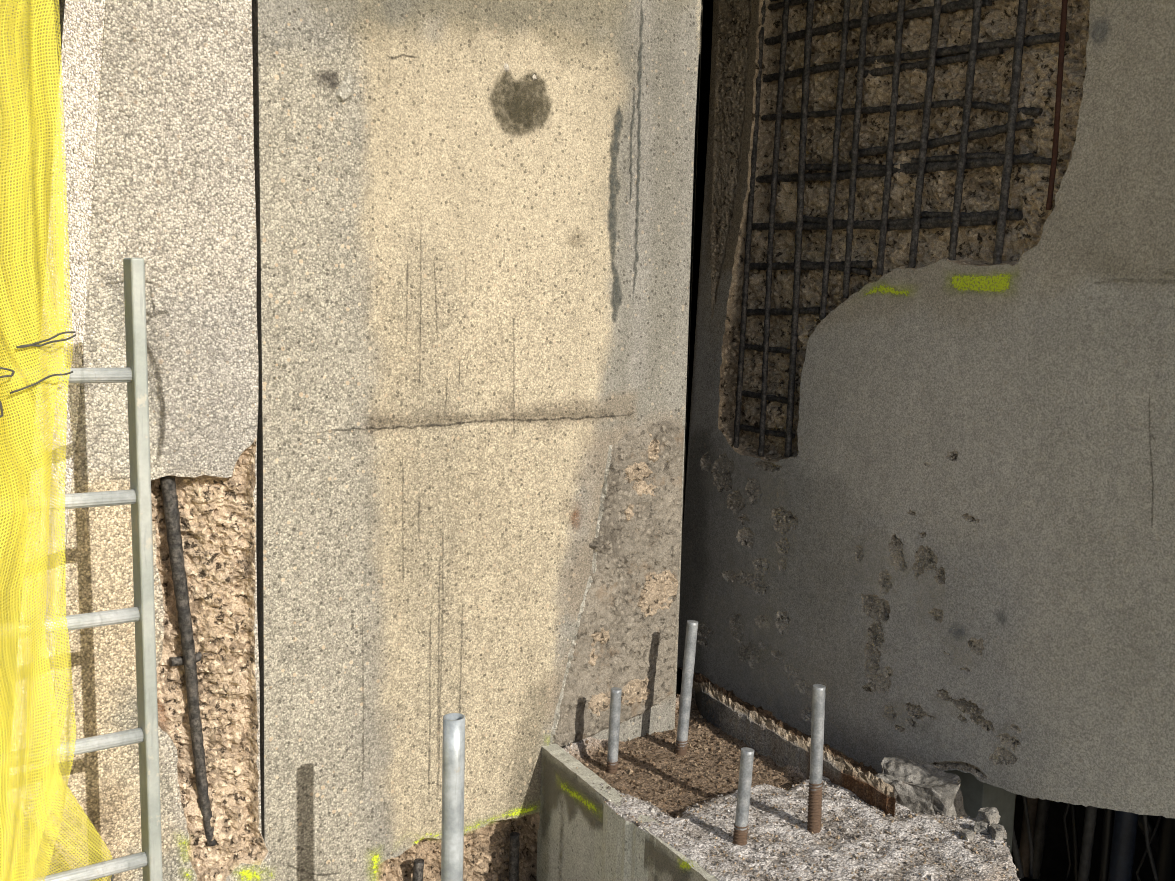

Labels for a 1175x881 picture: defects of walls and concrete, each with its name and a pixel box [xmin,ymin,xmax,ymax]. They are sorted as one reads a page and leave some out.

water stain [491,63,550,134]
water stain [609,11,644,321]
spalling [700,0,1090,549]
crack [145,280,166,453]
spalling [151,438,268,881]
spalling [697,622,714,647]
spalling [861,531,946,732]
spalling [929,688,1021,780]
spalling [375,838,441,881]
spalling [463,812,540,881]